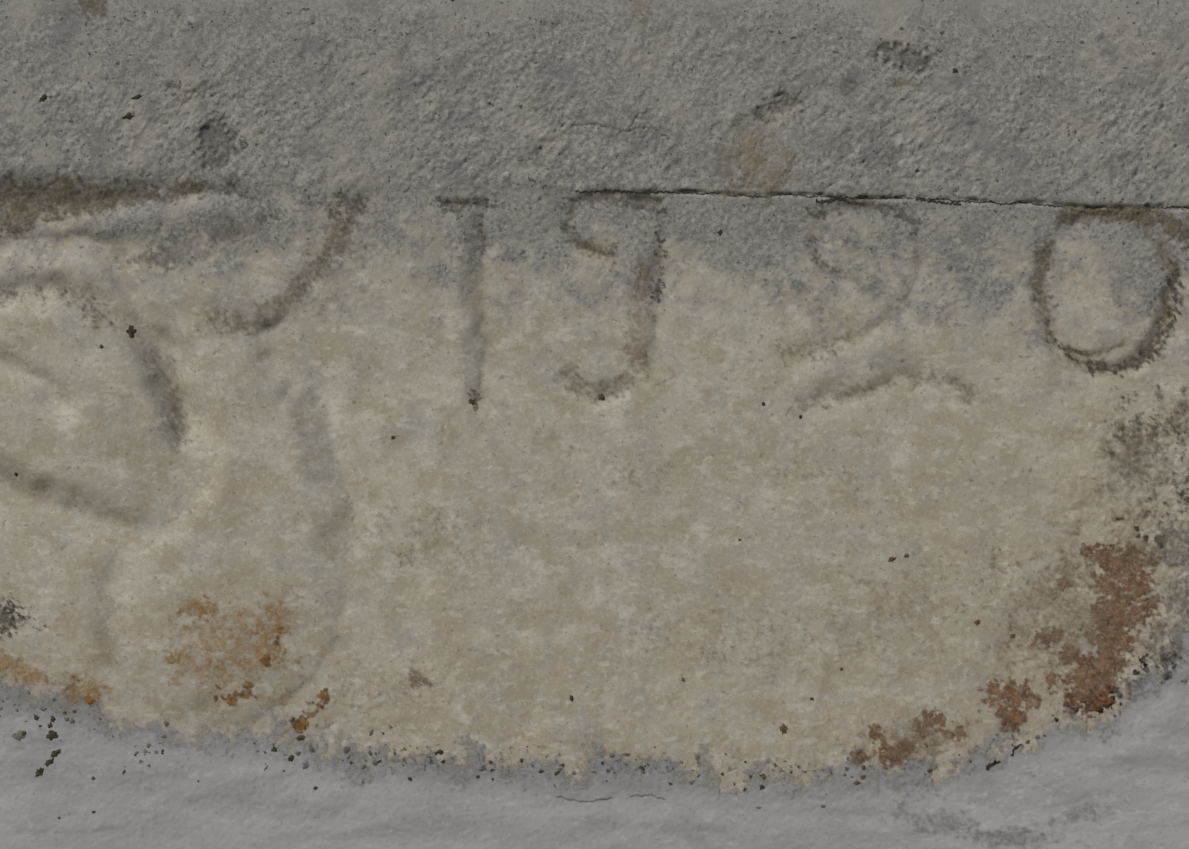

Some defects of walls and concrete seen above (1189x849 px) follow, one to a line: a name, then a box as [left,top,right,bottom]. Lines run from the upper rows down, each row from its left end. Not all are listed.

crack [575,188,1189,216]
corrosion [165,600,290,706]
corrosion [977,526,1168,740]
corrosion [849,710,969,769]